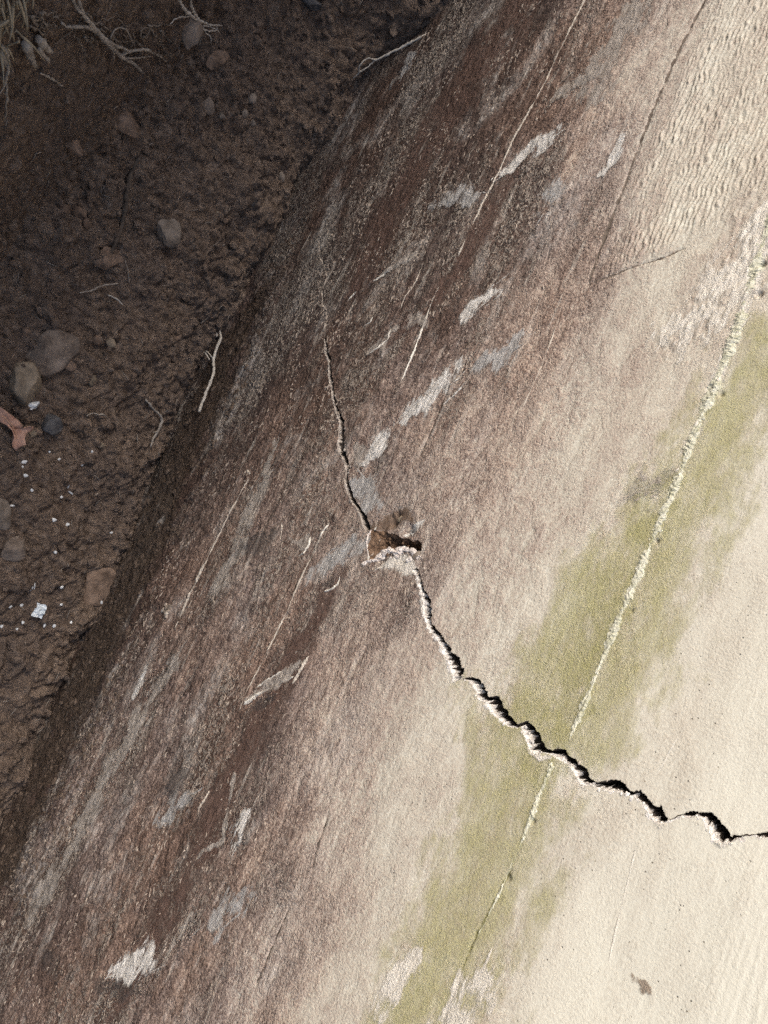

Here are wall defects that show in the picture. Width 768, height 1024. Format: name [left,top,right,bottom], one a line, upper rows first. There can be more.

crack [318,231,403,531]
spalling [361,508,425,576]
crack [413,570,768,847]